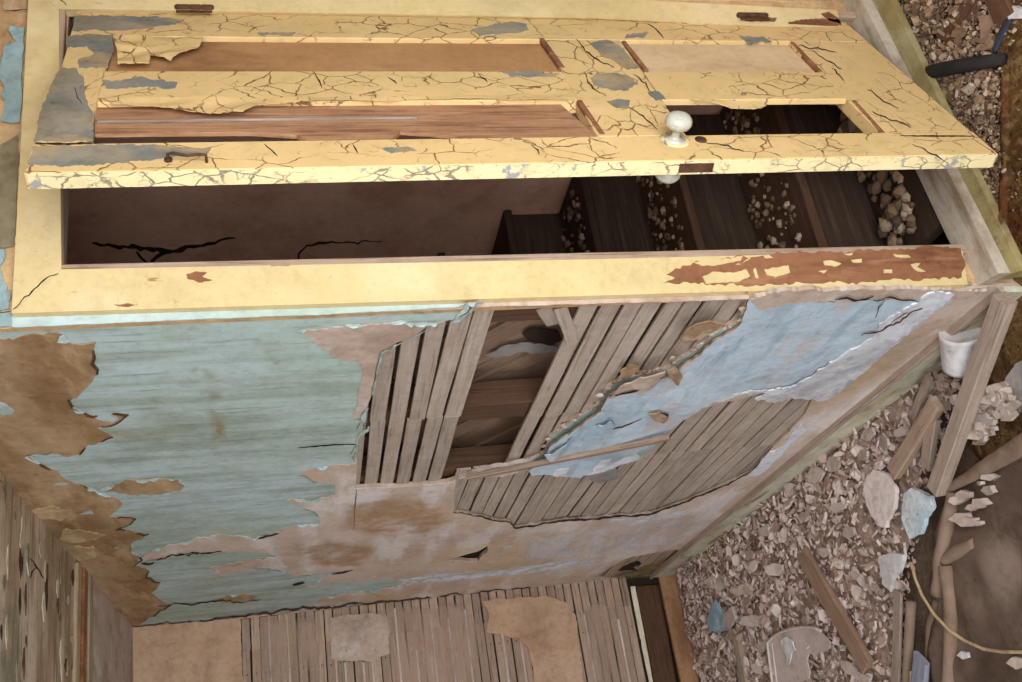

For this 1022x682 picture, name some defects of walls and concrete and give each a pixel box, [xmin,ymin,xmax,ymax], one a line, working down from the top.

peeling [788,12,842,26]
crack [92,237,235,263]
peeling [0,245,998,682]